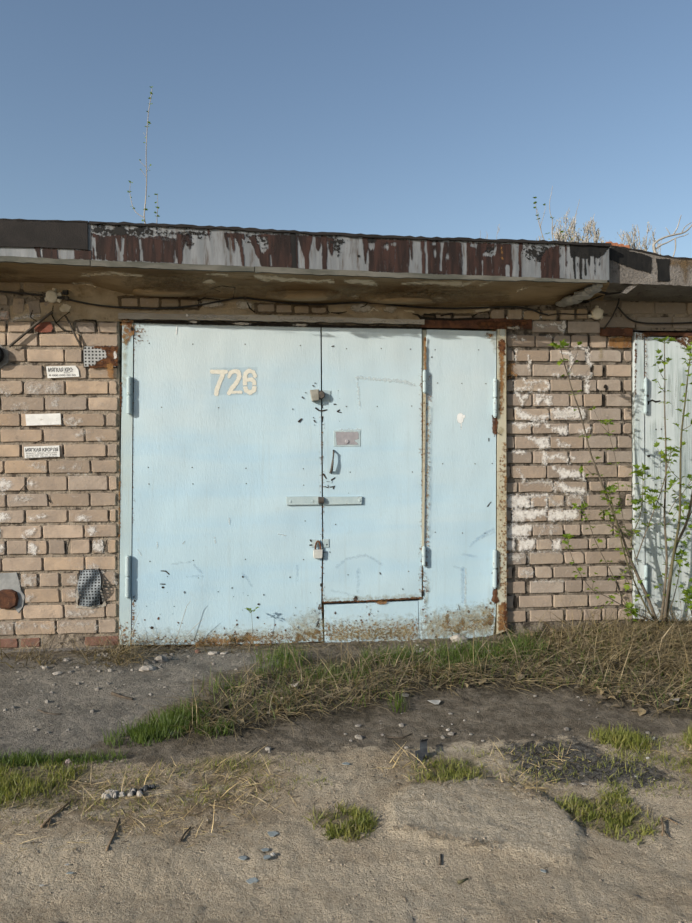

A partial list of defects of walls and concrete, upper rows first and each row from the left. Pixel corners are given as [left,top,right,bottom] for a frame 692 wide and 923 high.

rust [34,247,58,259]
rust [74,233,192,264]
rust [224,232,334,269]
leakage [560,346,592,393]
rust [117,320,527,647]
leakage [506,373,589,582]